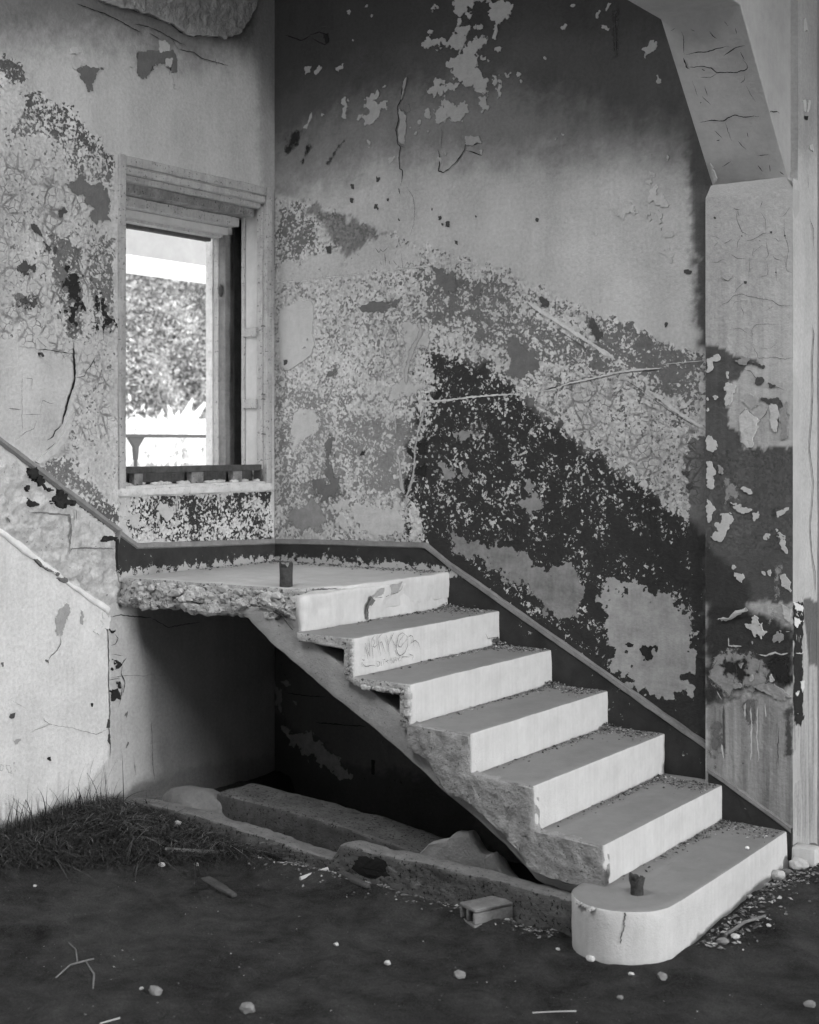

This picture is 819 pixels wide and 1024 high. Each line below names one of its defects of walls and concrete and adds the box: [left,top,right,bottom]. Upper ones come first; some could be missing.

crack [79,4,228,66]
crack [395,65,415,232]
peeling [410,0,523,173]
crack [671,21,784,175]
peeling [59,265,118,333]
crack [9,345,95,449]
peeling [706,354,789,448]
crack [714,203,816,589]
spalling [0,456,296,663]
peeling [705,435,760,542]
peeling [745,507,806,727]
crack [575,901,596,911]